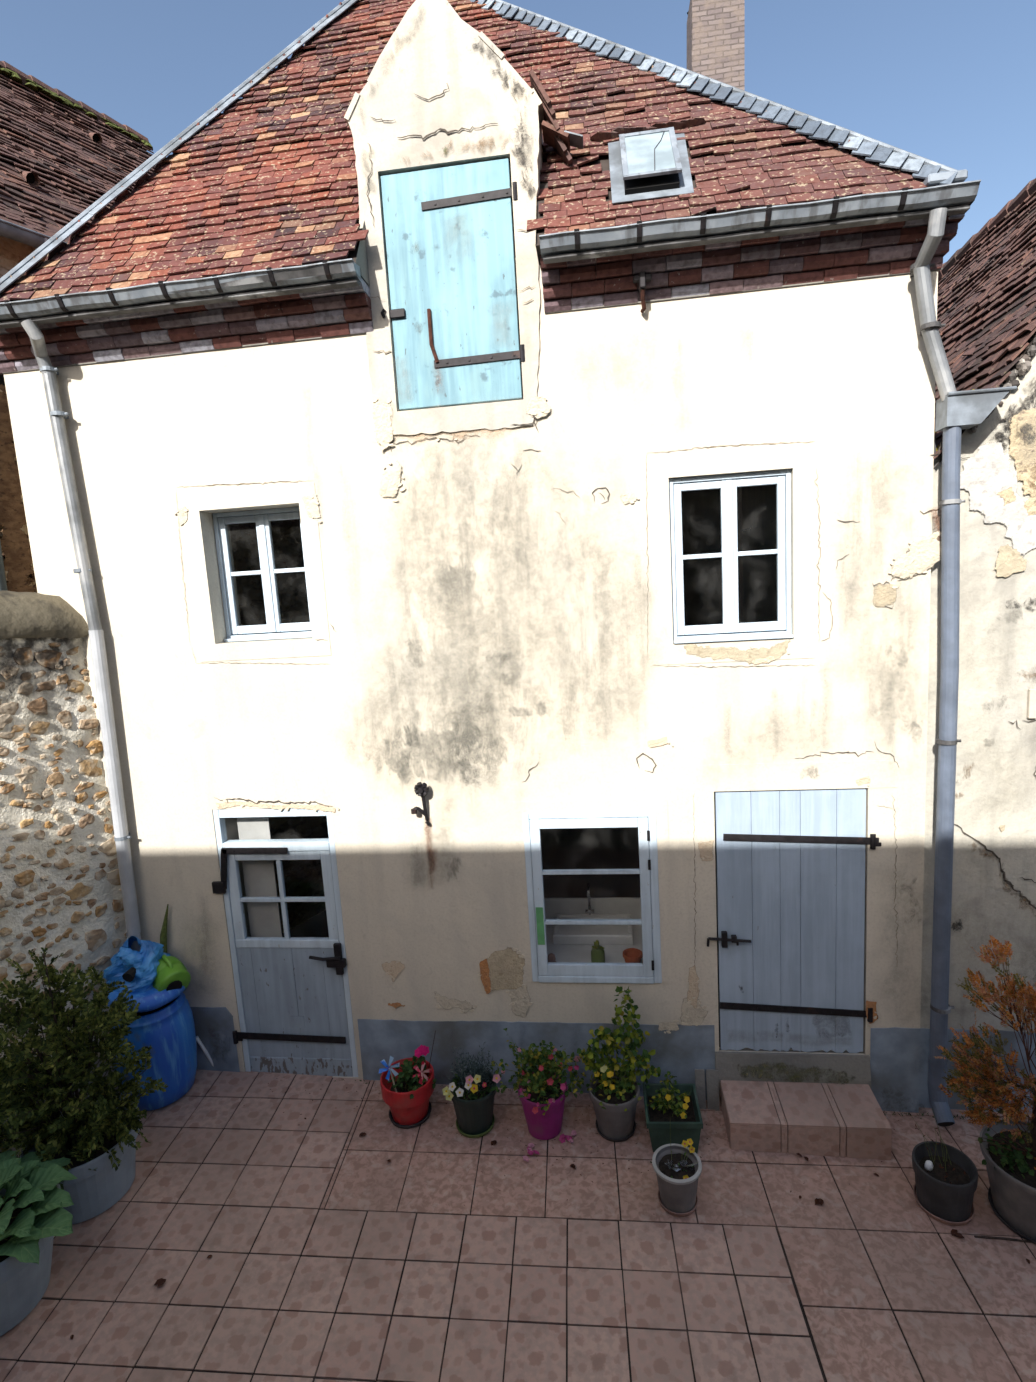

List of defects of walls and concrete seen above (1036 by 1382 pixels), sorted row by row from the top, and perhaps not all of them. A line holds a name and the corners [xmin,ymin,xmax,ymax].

flaking render [372,398,394,452]
flaking render [526,396,550,418]
flaking render [960,408,1036,577]
peeling [873,584,897,607]
flaking render [684,640,790,666]
flaking render [214,797,339,813]
crack [954,824,1036,909]
flaking render [478,947,527,994]
flaking render [659,965,708,1033]